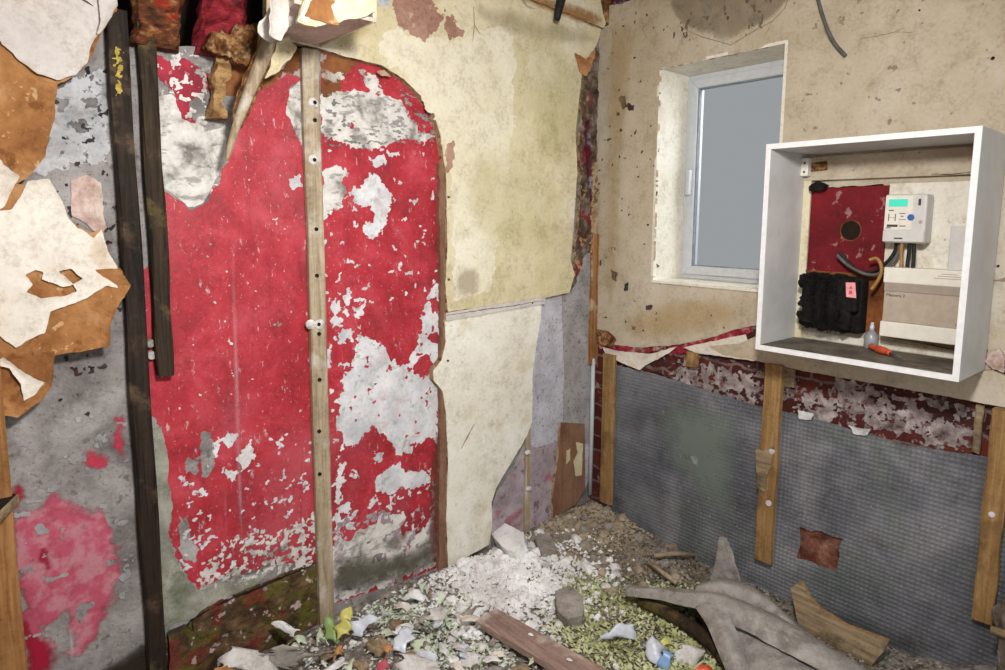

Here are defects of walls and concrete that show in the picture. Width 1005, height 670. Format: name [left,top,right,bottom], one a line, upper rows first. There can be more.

peeling [377,0,465,42]
water stain [663,13,715,41]
peeling [33,66,111,176]
peeling [157,50,227,207]
peeling [280,174,303,190]
peeling [286,82,302,145]
peeling [320,69,435,240]
peeling [430,140,455,200]
peeling [325,245,439,604]
spalling [153,427,318,670]
spalling [797,527,843,571]